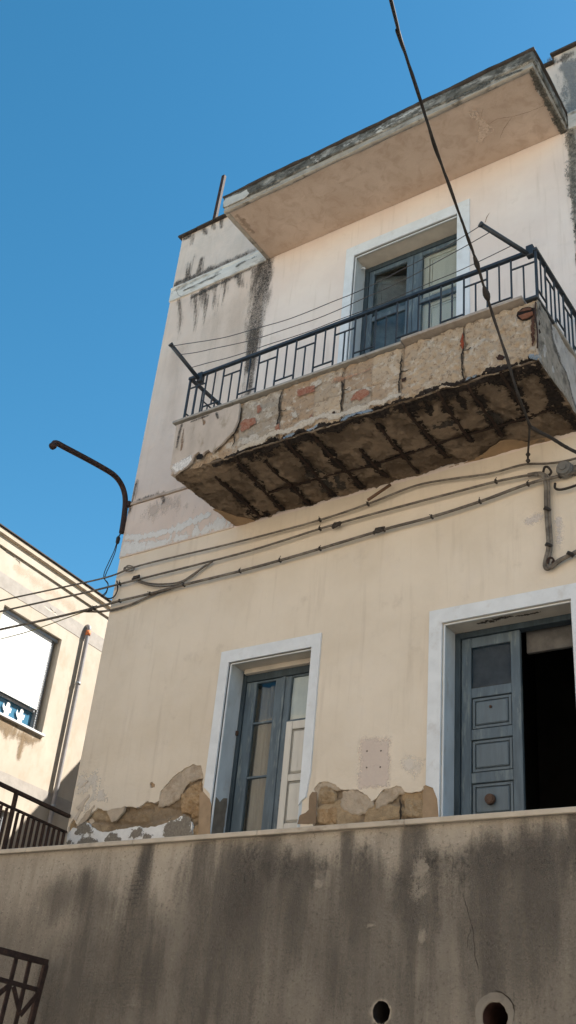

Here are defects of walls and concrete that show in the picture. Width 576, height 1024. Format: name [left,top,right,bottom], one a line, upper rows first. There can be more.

damp [174,253,273,397]
spalling [120,300,576,557]
damp [118,844,153,966]
flaking render [66,765,227,845]
damp [341,831,370,899]
flaking render [297,782,439,826]
damp [394,814,576,1000]